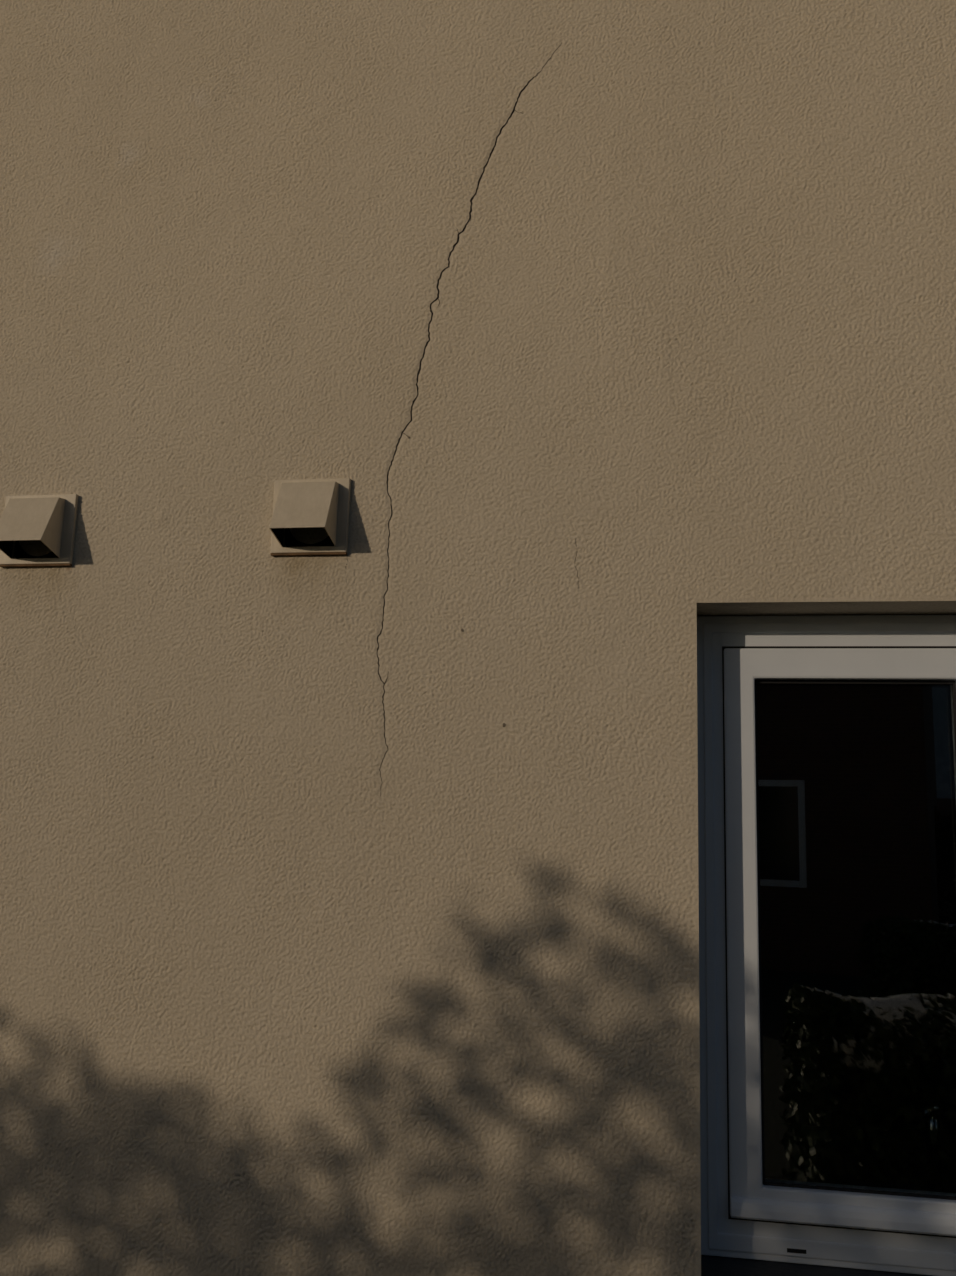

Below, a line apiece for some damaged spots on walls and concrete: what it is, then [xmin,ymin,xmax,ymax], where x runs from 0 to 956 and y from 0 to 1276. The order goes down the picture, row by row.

crack [377,43,562,797]